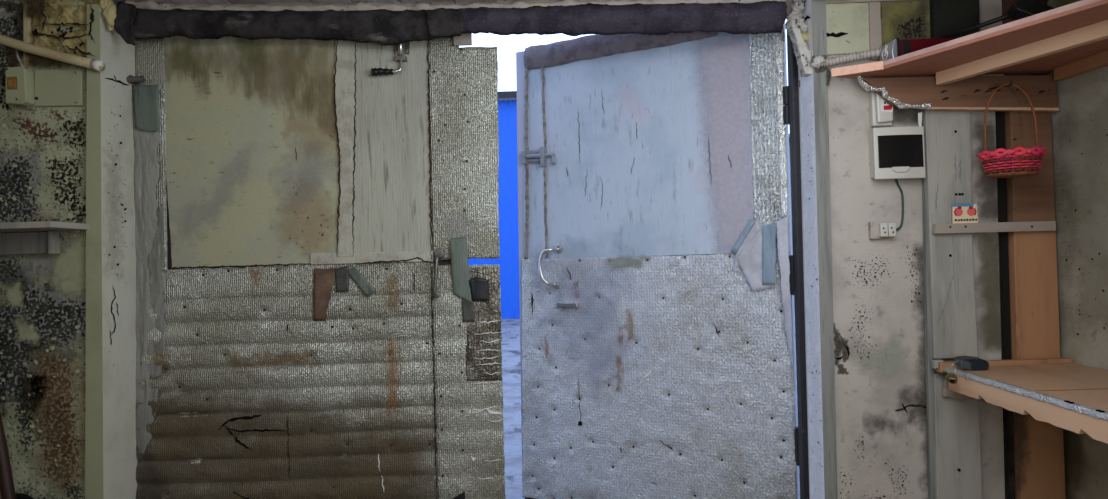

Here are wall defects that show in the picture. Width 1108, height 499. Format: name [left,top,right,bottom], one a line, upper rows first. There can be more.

leakage [0,13,24,110]
spalling [0,0,99,68]
leakage [25,118,86,234]
leakage [0,272,86,499]
leakage [901,249,927,425]